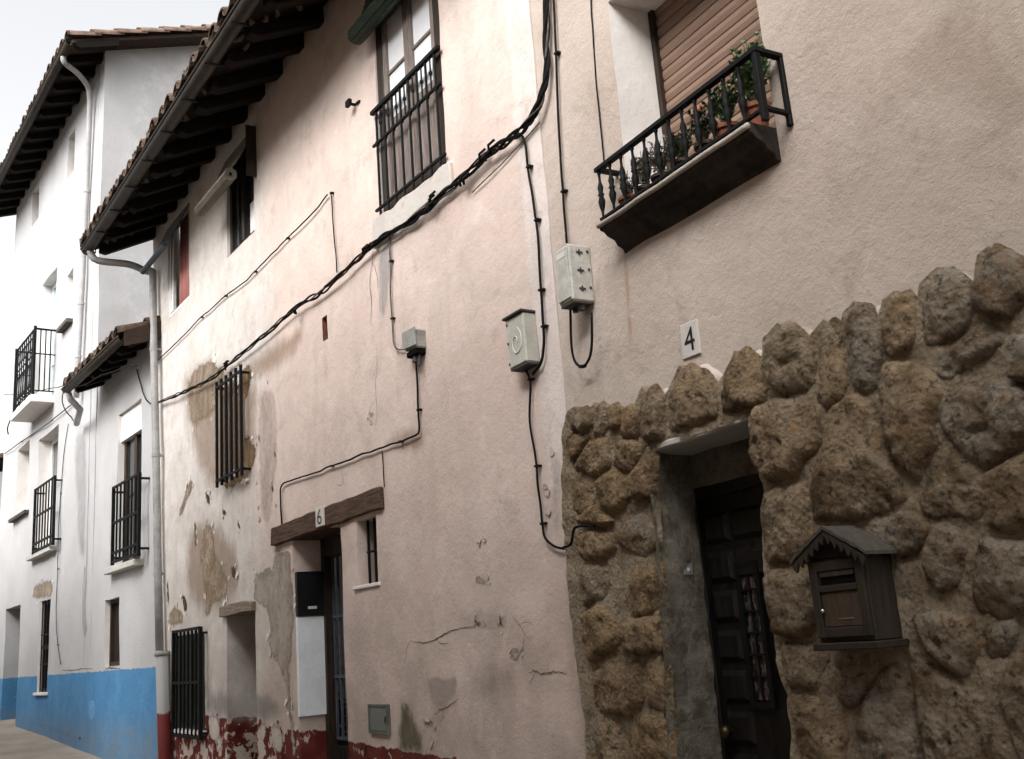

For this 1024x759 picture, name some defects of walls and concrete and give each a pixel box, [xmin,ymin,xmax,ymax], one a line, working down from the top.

peeling [186,352,224,432]
flaking render [237,363,254,400]
peeling [179,473,240,615]
peeling [33,578,52,604]
peeling [166,582,187,631]
peeling [250,550,297,758]
crack [404,626,471,664]
peeling [208,713,222,756]